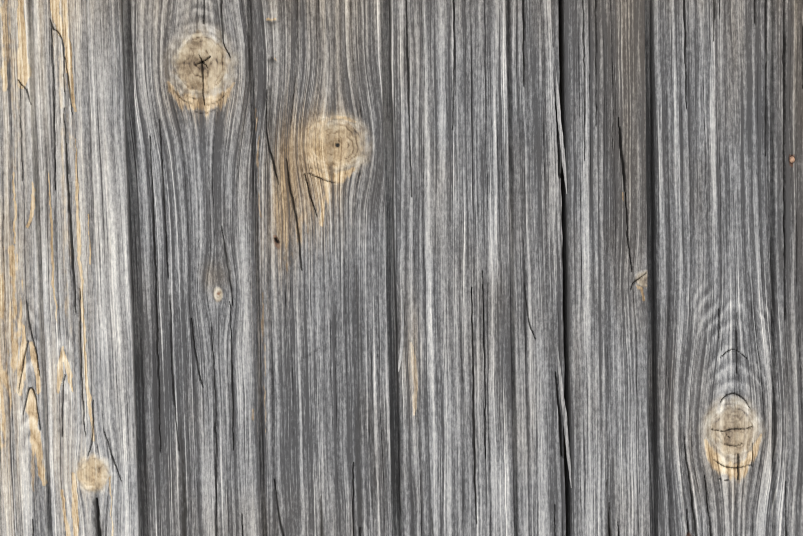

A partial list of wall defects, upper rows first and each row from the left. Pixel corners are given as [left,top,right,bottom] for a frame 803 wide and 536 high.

crack [17,79,33,178]
crack [18,304,41,430]
crack [50,21,121,480]
crack [149,120,180,451]
crack [191,228,234,536]
crack [265,98,332,270]
crack [553,86,561,179]
crack [555,372,563,456]
crack [582,0,598,157]
crack [618,120,646,288]